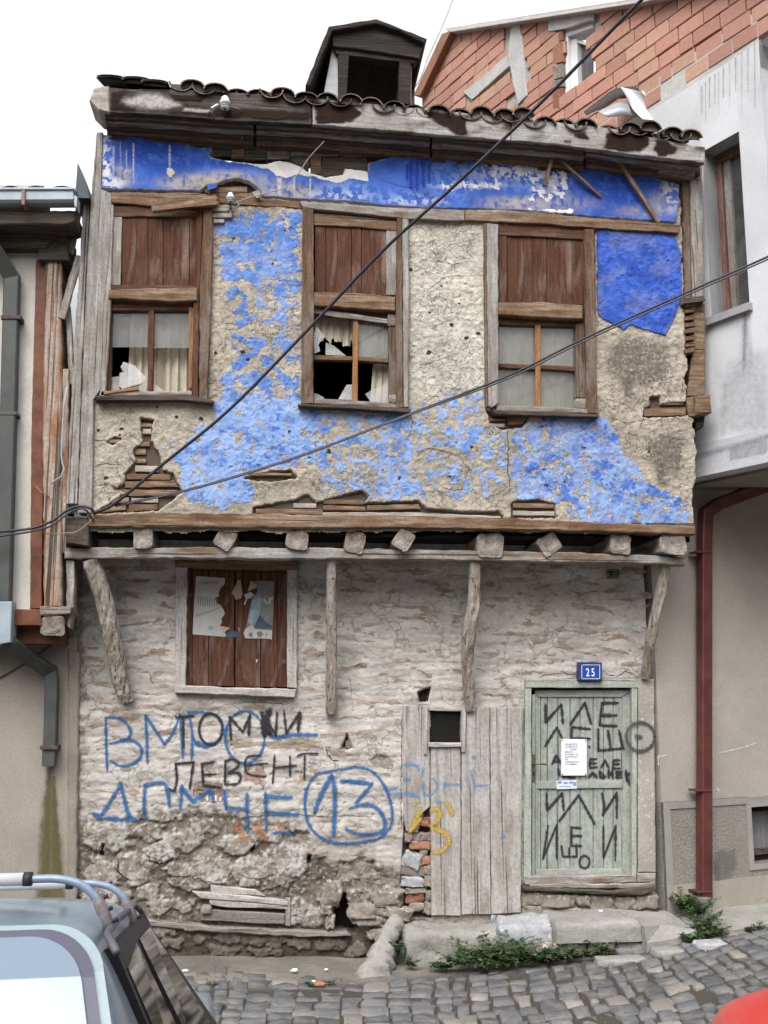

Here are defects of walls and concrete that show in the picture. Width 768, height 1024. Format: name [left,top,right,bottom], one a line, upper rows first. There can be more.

peeling [238,161,369,183]
peeling [442,164,573,215]
peeling [97,190,690,525]
leakage [44,777,59,874]
flaking render [320,816,431,940]